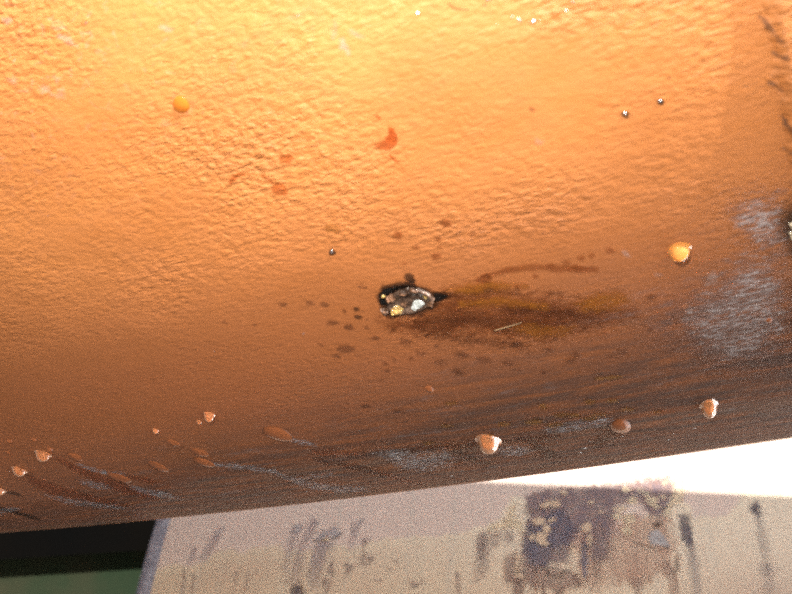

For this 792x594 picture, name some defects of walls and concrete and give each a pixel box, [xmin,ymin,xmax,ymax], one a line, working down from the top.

corrosion [382,127,397,162]
peeling [782,211,792,240]
corrosion [380,273,418,316]